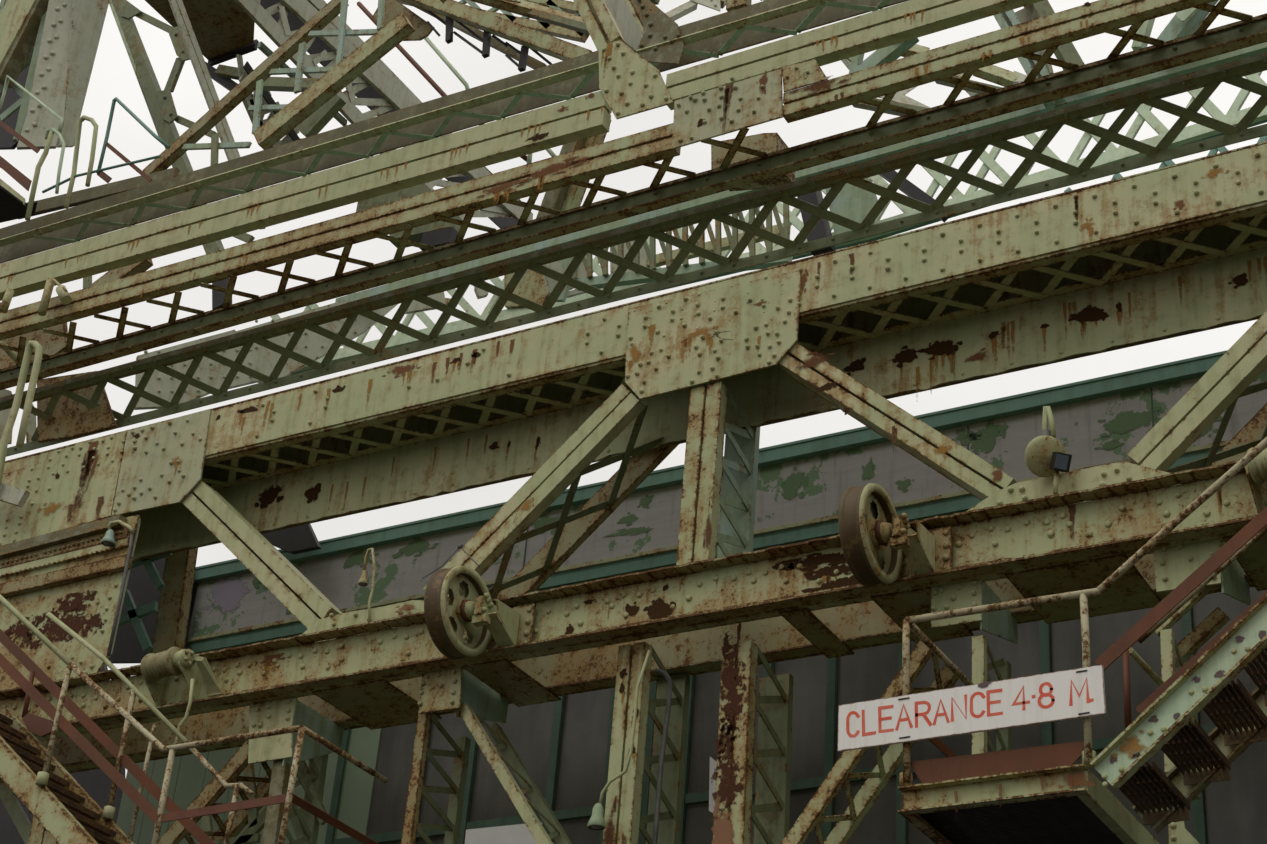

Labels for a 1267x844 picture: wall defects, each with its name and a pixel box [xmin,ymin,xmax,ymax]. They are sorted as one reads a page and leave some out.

rust [889,320,1015,391]
peeling [952,420,1008,455]
peeling [1094,407,1164,450]
rust [38,441,104,522]
peeling [782,466,809,500]
peeling [862,457,875,480]
peeling [895,477,911,492]
rust [772,552,860,593]
rust [3,590,104,650]
peeling [205,574,267,615]
rust [625,583,676,620]
rust [711,623,747,814]